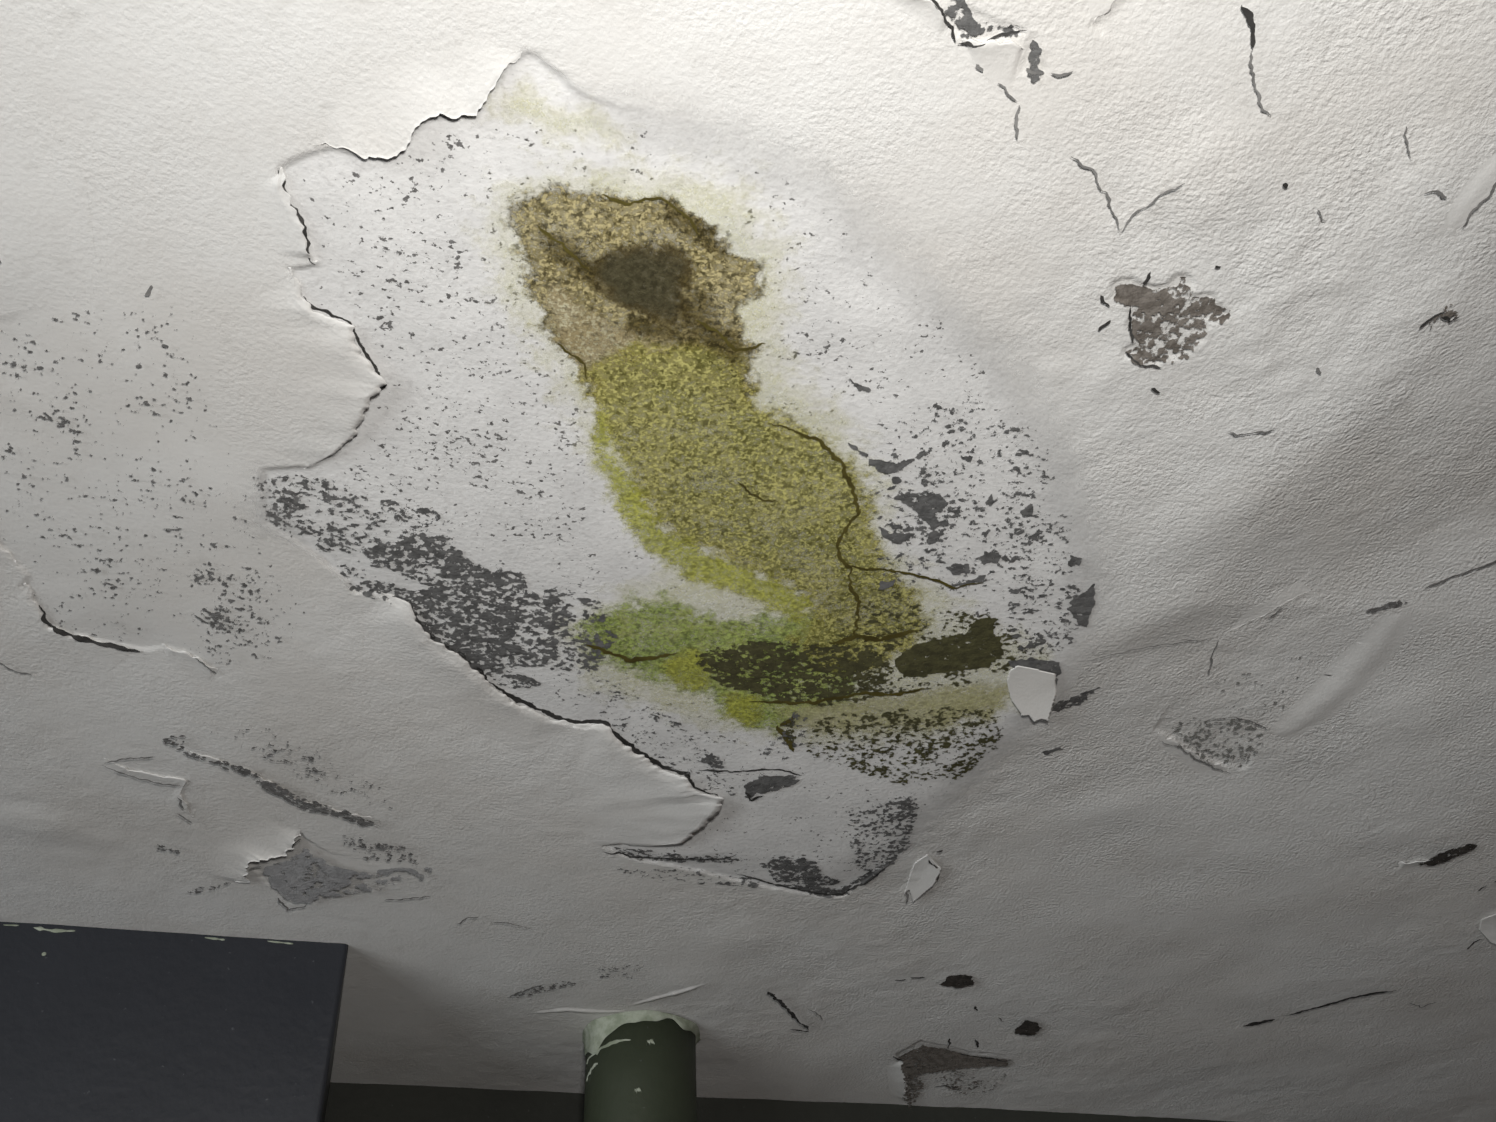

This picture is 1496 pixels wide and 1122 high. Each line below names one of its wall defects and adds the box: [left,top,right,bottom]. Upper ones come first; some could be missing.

spalling [885,0,1073,101]
crack [1241,5,1271,116]
spalling [1098,271,1234,368]
peeling [0,39,1100,911]
leakage [509,185,1005,732]
crack [738,482,776,502]
crack [769,423,979,641]
peeling [1158,582,1411,776]
spalling [1396,844,1478,874]
peeling [887,1038,1011,1108]